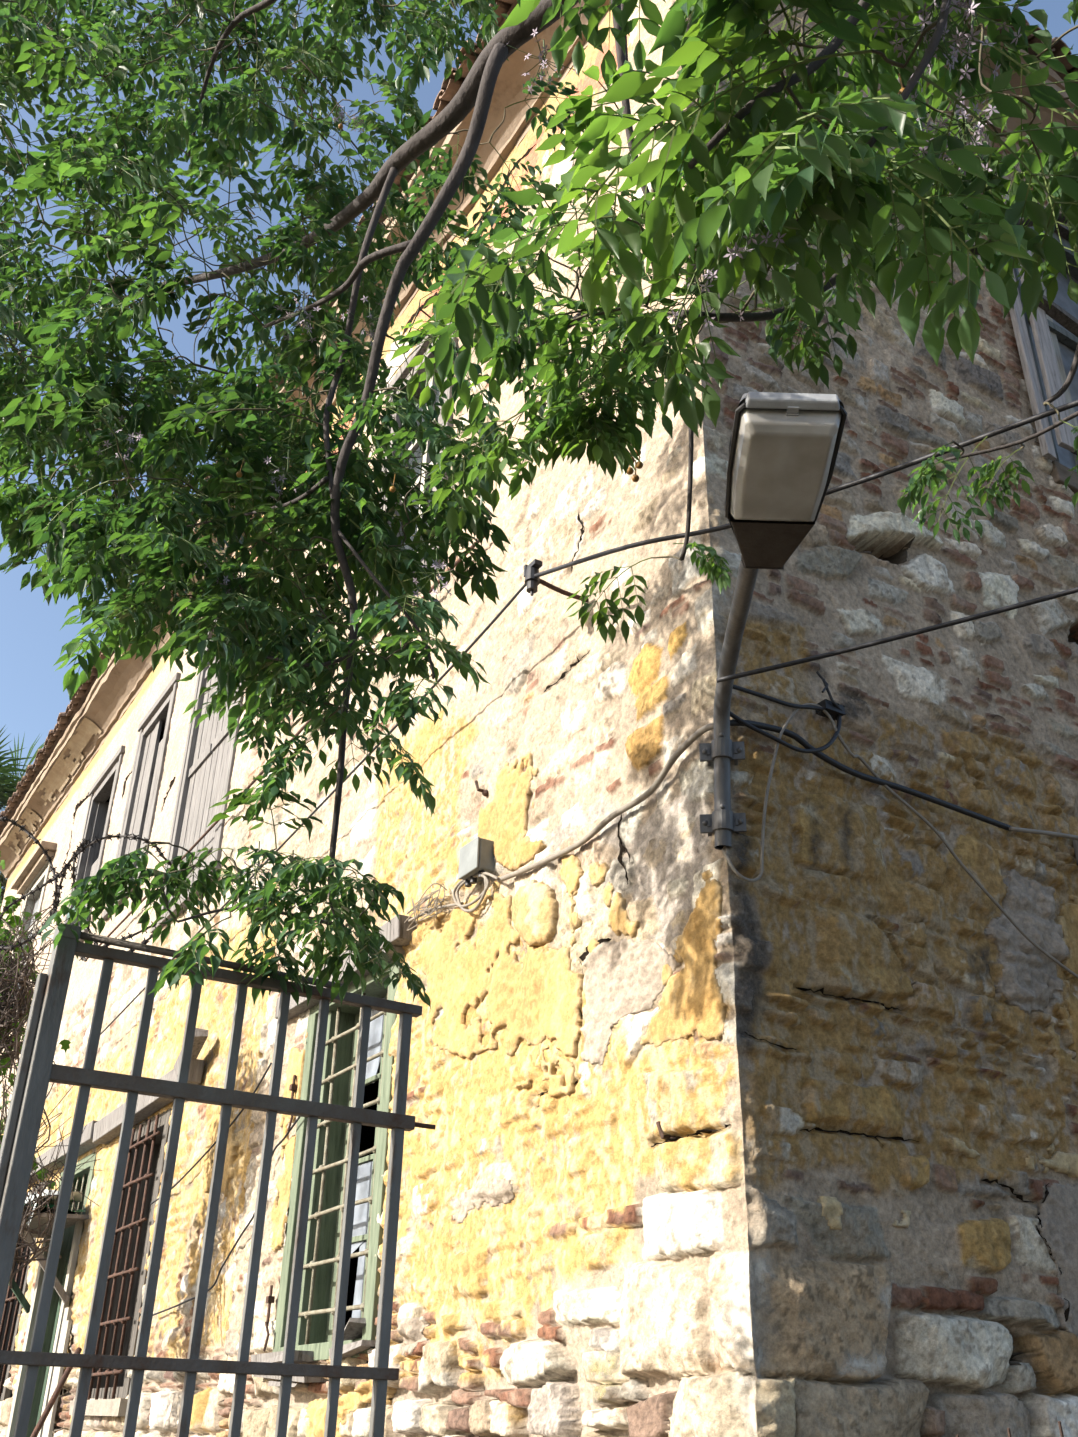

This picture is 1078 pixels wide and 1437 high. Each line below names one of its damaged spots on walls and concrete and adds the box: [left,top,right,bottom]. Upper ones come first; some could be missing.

crack [617,814,630,884]
peeling [422,753,727,1097]
crack [651,1124,731,1147]
crack [800,1127,919,1142]
peeling [816,1196,843,1230]
crack [981,1179,1070,1322]